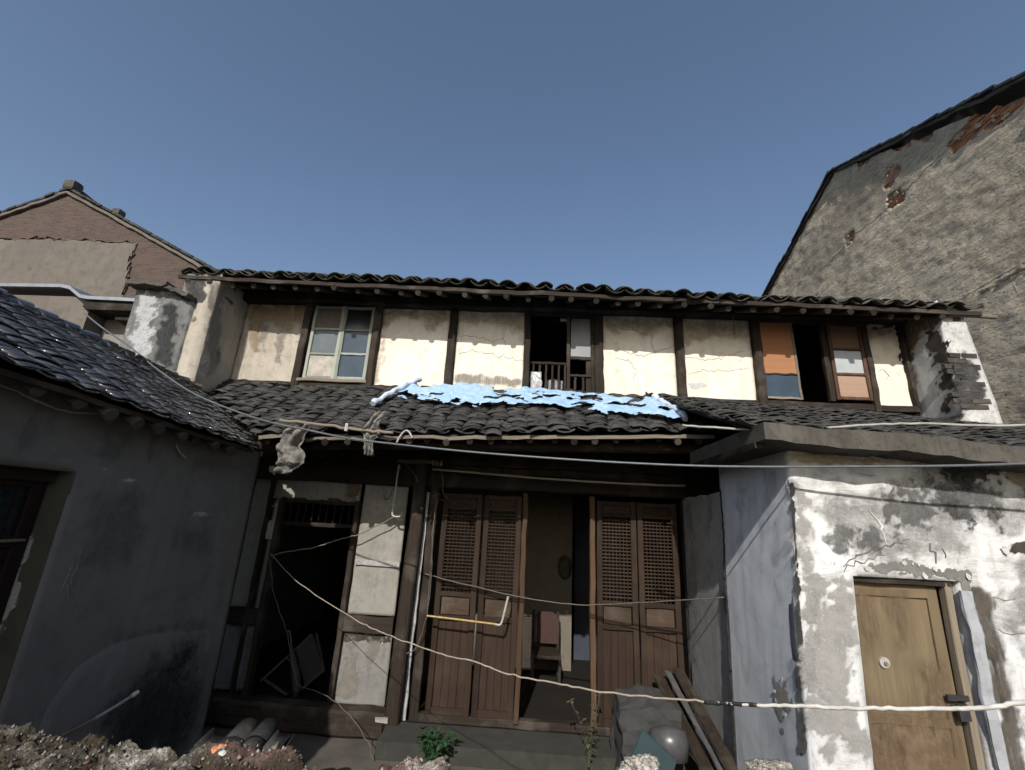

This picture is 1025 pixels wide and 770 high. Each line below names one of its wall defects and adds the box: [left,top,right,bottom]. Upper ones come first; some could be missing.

spalling [948,97,1025,154]
spalling [883,134,934,209]
spalling [921,329,992,414]
peeling [1001,541,1025,555]